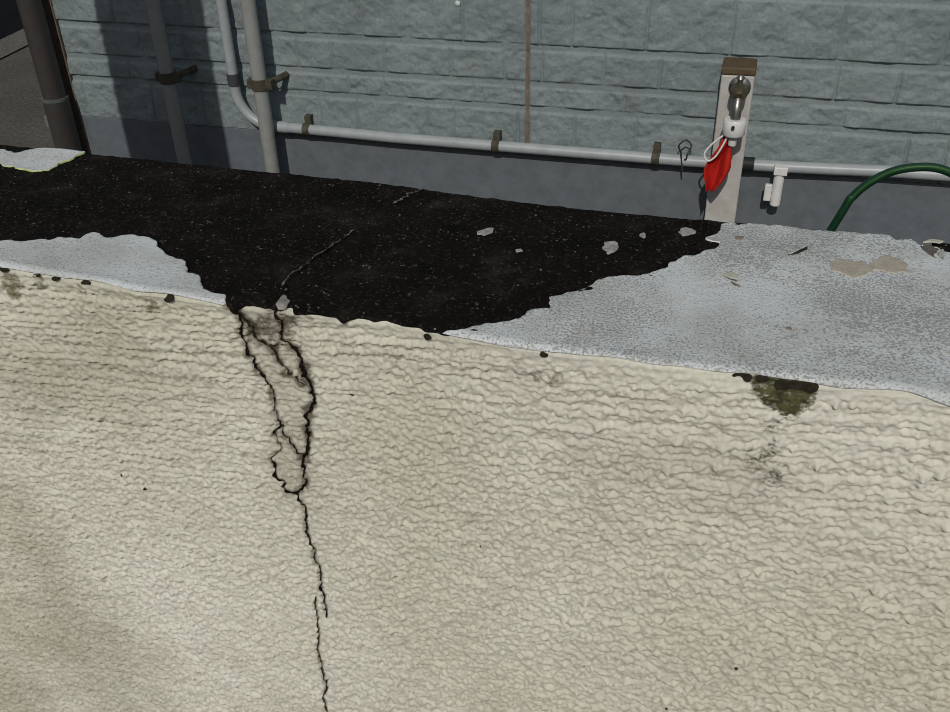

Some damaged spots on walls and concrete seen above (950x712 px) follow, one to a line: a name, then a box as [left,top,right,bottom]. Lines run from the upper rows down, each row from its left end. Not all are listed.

peeling [0,145,34,153]
peeling [0,154,745,340]
crack [225,230,355,711]